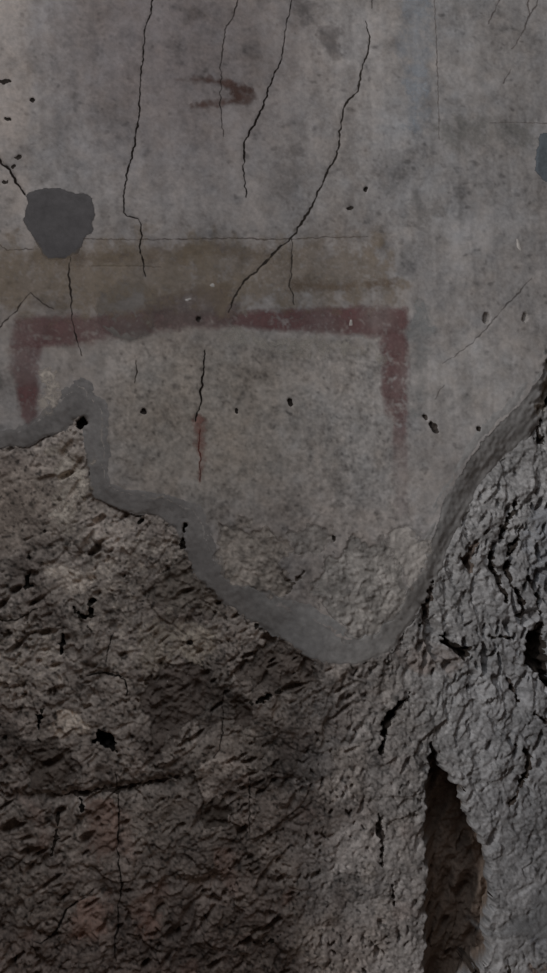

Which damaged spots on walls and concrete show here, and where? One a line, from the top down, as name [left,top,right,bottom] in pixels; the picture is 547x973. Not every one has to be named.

crack [0,159,26,195]
crack [123,0,153,277]
crack [219,0,372,313]
crack [195,350,206,480]
spalling [215,519,432,640]
spalling [138,661,212,762]
spalling [234,640,321,697]
spalling [29,736,76,801]
flaking render [71,896,107,940]